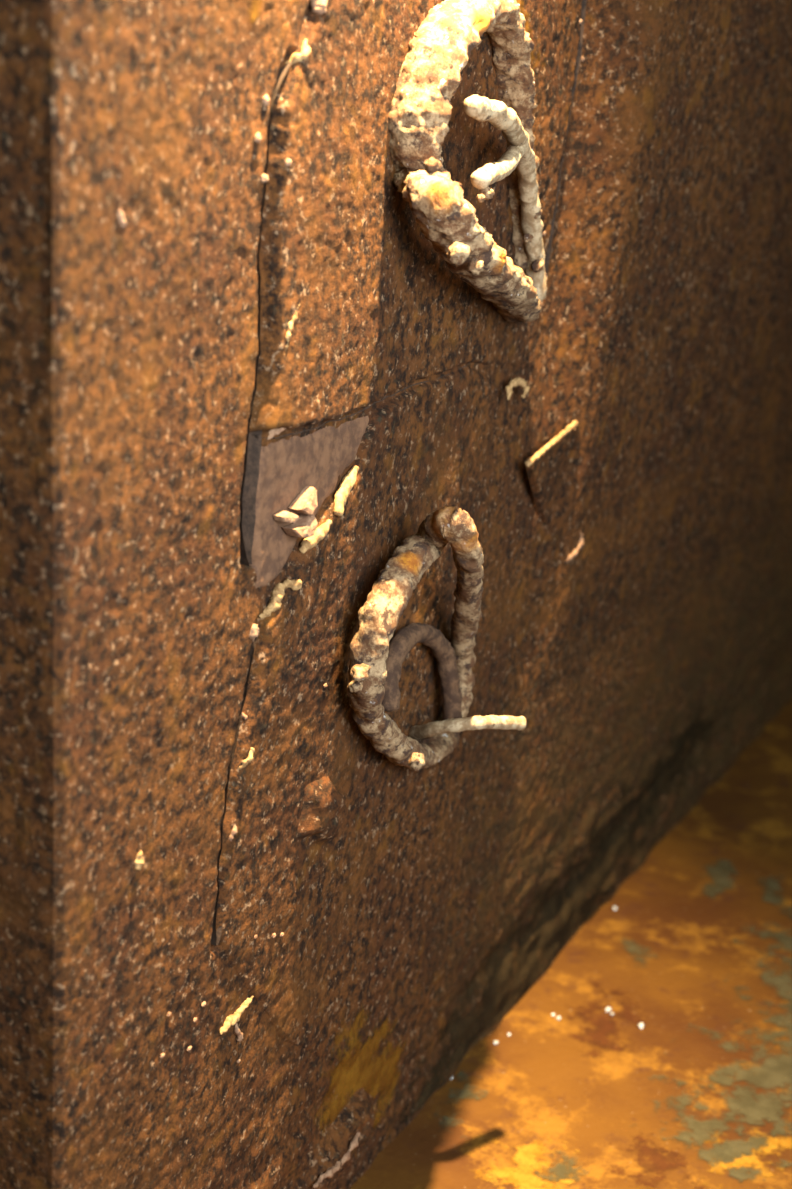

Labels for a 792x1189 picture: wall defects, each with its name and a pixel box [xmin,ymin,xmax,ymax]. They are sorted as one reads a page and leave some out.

crack [239,0,470,566]
flaking render [505,377,529,400]
flaking render [249,416,369,588]
flaking render [525,420,580,527]
flaking render [565,531,584,562]
crack [211,465,359,946]
corrosion [571,983,637,1056]
corrosion [476,1141,575,1189]
corrosion [635,1138,686,1188]
corrosion [710,1128,792,1177]